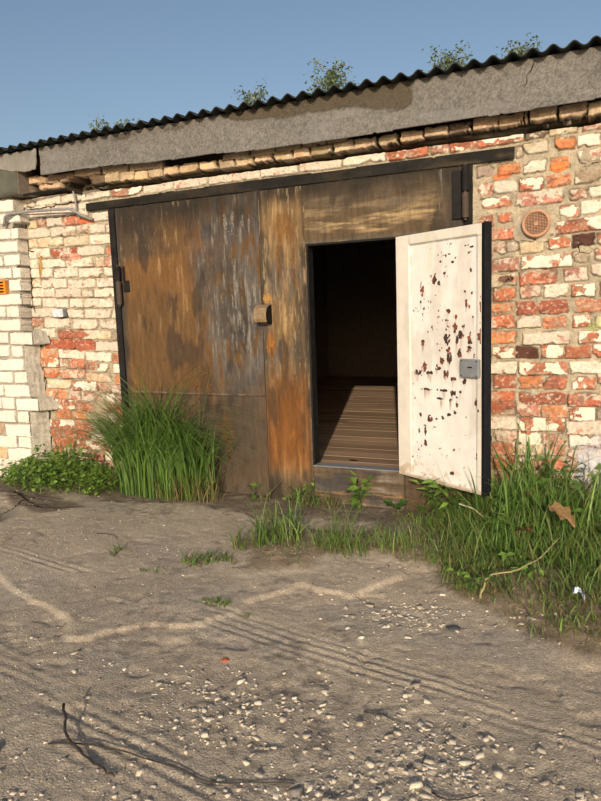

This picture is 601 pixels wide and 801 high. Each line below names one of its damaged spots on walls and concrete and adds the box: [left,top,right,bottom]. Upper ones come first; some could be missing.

peeling [474,134,524,144]
peeling [555,133,600,149]
peeling [520,177,543,191]
peeling [584,215,601,229]
peeling [498,205,578,283]
peeling [575,283,595,297]
peeling [573,315,601,351]
corrosion [412,242,481,461]
peeling [492,347,534,375]
peeling [542,345,568,375]
peeling [74,381,115,402]
peeling [517,407,595,444]